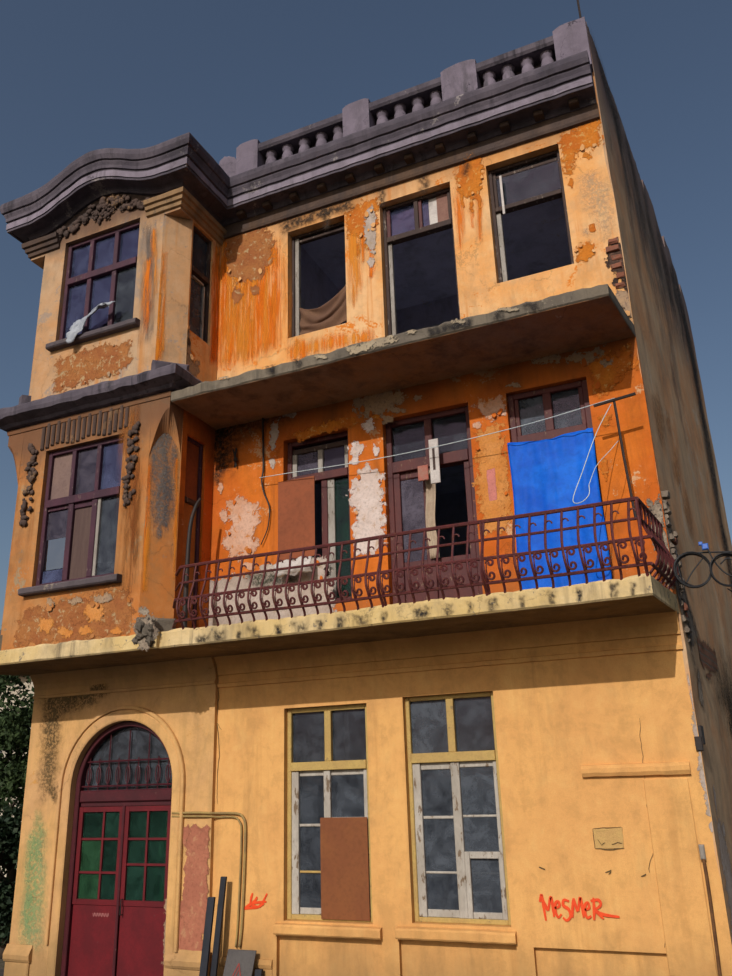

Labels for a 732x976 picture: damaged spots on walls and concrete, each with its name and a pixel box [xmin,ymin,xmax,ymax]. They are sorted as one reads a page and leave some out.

peeling [557,119,605,188]
peeling [53,340,134,393]
rust [211,241,286,367]
peeling [224,227,275,306]
peeling [344,197,381,268]
rust [457,199,482,247]
water stain [595,47,732,589]
water stain [148,433,177,537]
peeling [346,440,388,556]
flaking render [208,482,337,626]
peeling [13,586,158,652]
spalling [645,490,718,737]